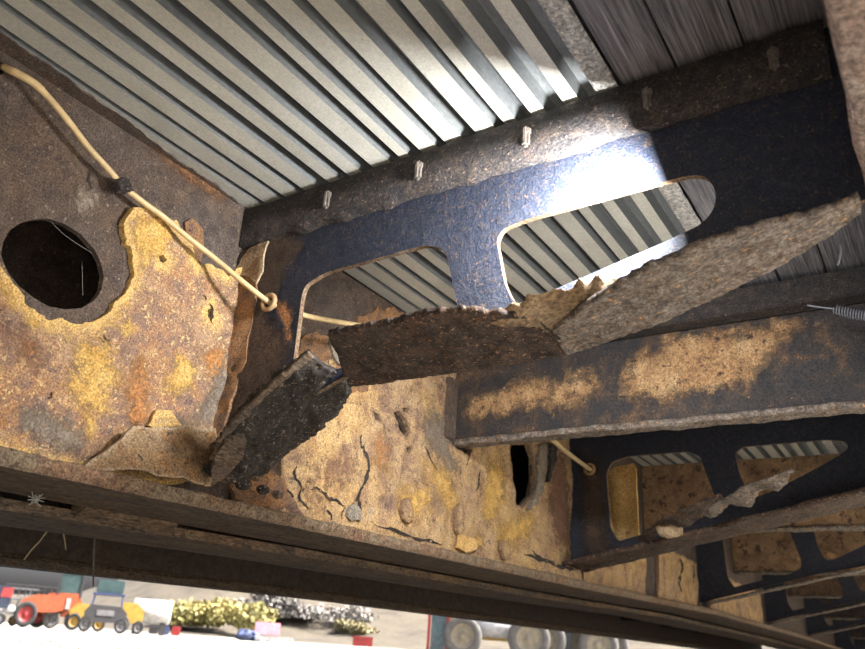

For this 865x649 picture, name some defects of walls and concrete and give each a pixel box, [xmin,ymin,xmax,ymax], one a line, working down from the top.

corrosion [68,186,99,223]
corrosion [620,318,798,403]
corrosion [0,207,763,623]
crack [287,434,370,520]
crack [376,525,442,545]
corrosion [636,467,794,543]